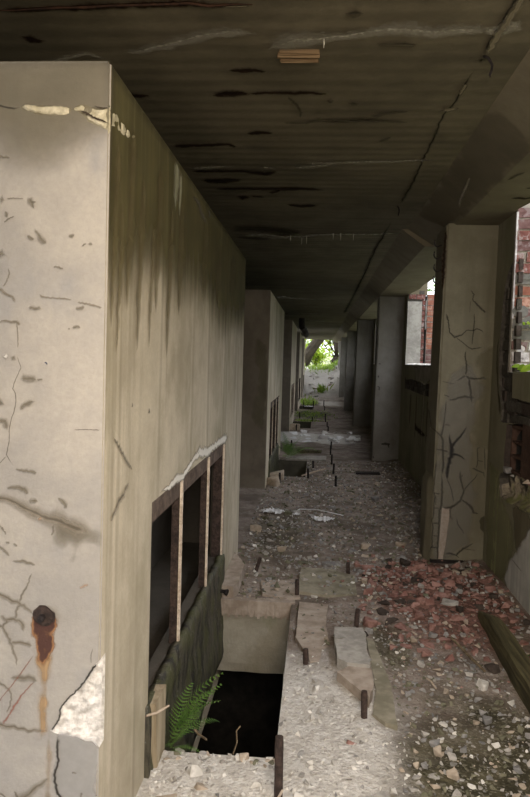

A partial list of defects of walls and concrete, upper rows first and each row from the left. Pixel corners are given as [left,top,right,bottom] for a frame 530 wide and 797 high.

spalling [22,105,135,138]
crack [40,295,101,308]
flaking render [502,259,530,426]
crack [415,292,500,558]
crack [0,496,87,535]
crack [0,574,32,664]
rust [0,617,57,700]
rust [39,696,47,732]
crack [0,649,96,797]
spalling [52,657,103,740]